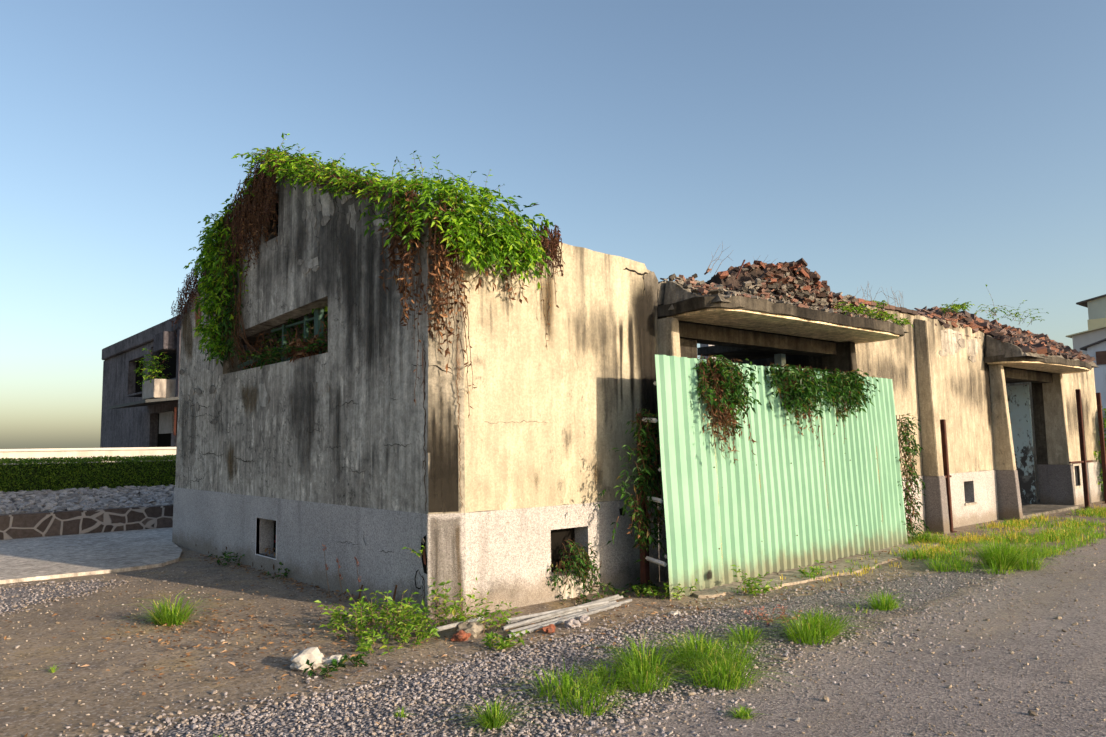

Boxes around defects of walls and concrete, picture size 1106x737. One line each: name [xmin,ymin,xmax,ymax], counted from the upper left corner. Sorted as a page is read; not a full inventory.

water stain [613,287,660,485]
water stain [427,396,463,614]